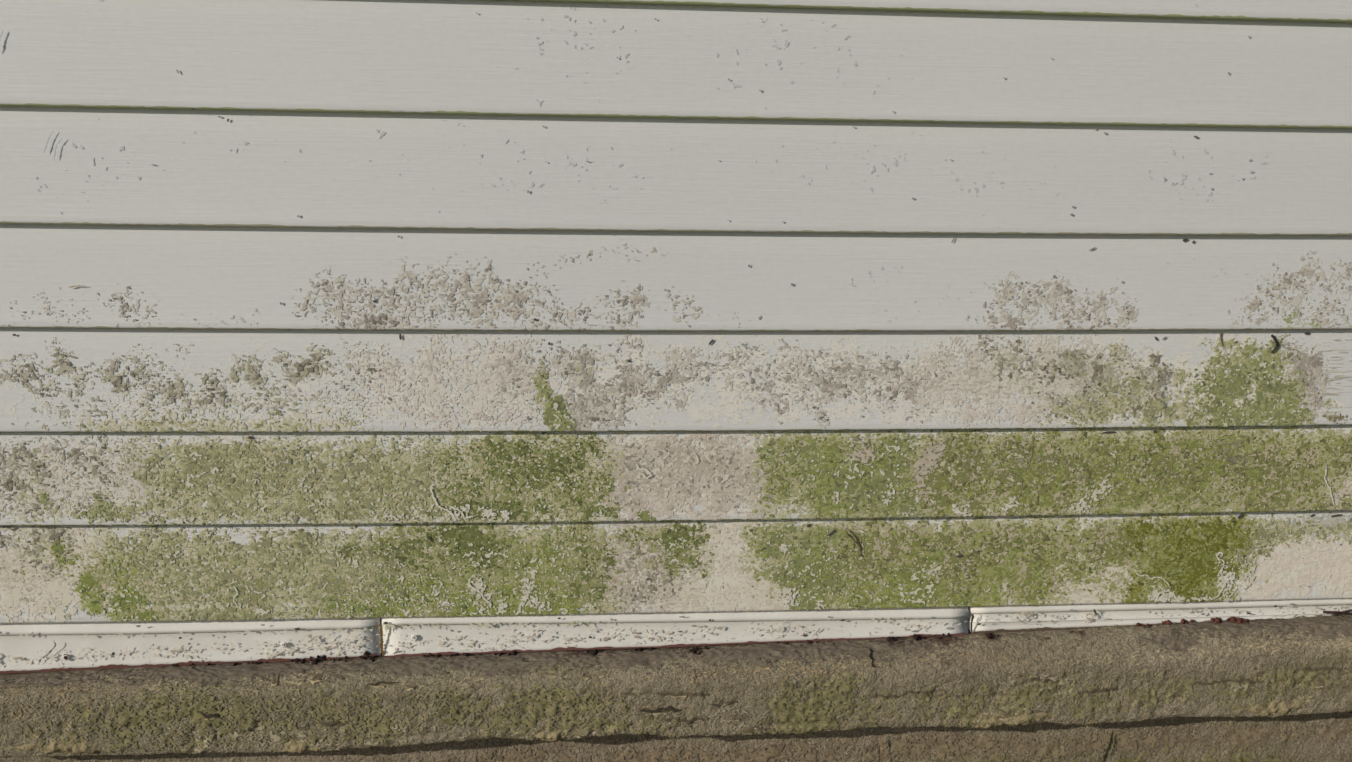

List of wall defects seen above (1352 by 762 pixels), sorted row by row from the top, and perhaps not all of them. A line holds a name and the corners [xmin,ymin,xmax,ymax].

damp [1212,248,1352,424]